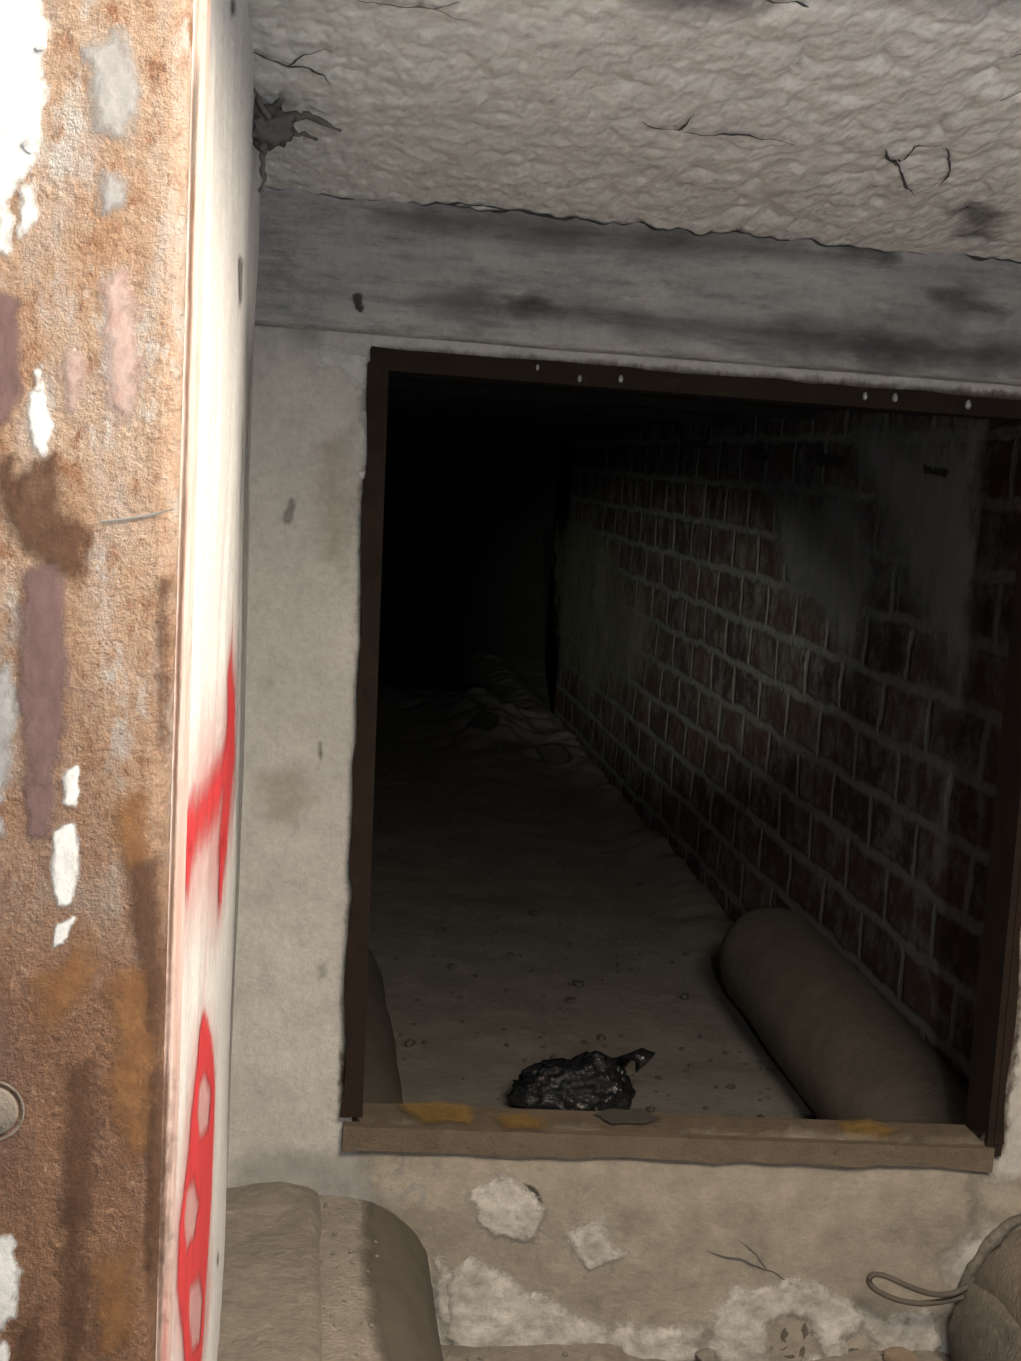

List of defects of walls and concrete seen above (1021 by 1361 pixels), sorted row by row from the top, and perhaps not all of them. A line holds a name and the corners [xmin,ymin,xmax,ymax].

crack [766,0,809,8]
crack [885,145,951,195]
corrosion [0,291,24,425]
corrosion [0,456,90,839]
corrosion [127,70,199,1361]
flaking render [358,1151,986,1361]